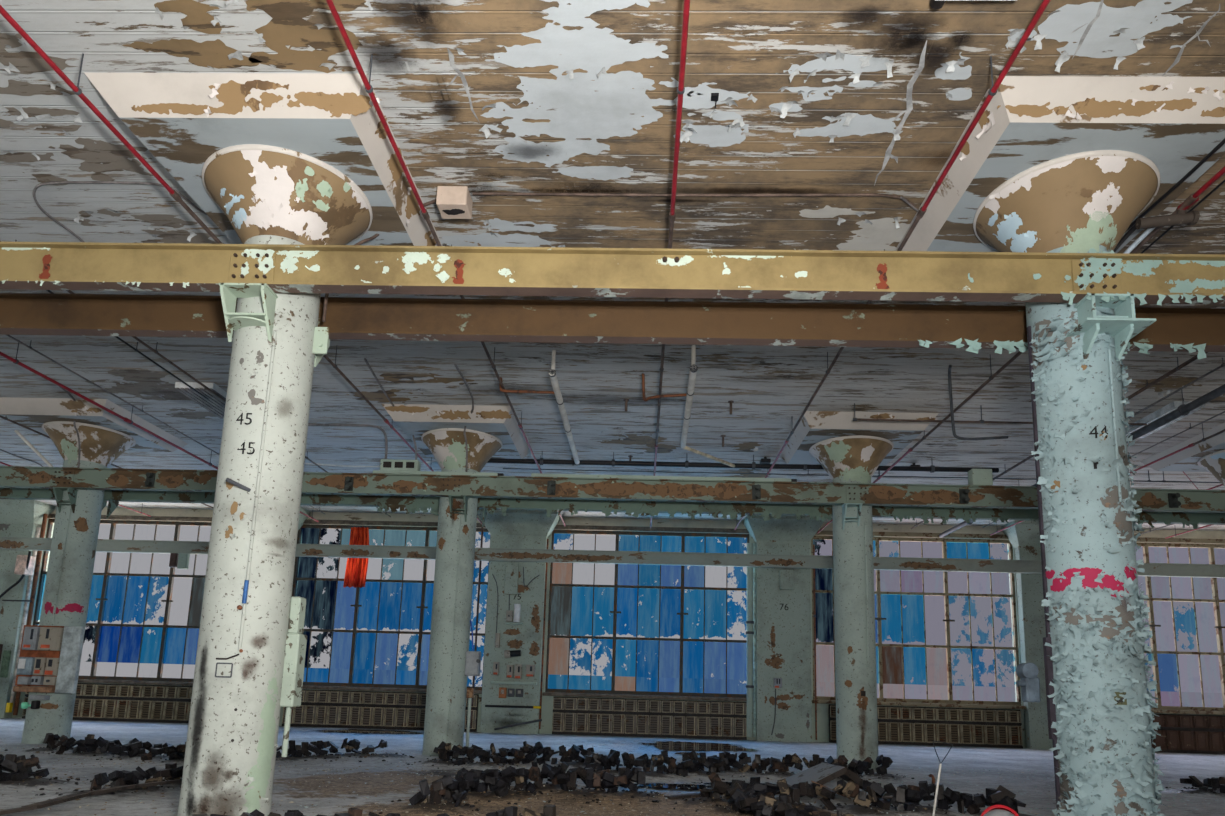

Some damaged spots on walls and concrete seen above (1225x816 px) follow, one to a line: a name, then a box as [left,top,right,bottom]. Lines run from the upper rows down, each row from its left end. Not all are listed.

peeling [0,33,153,186]
peeling [122,0,387,139]
peeling [479,0,903,181]
peeling [935,52,972,101]
peeling [959,81,1225,161]
peeling [1005,0,1193,73]
rust [39,254,52,279]
peeling [74,150,368,276]
rust [452,259,465,284]
peeling [354,218,565,283]
peeling [950,154,1225,816]
water stain [187,649,232,816]